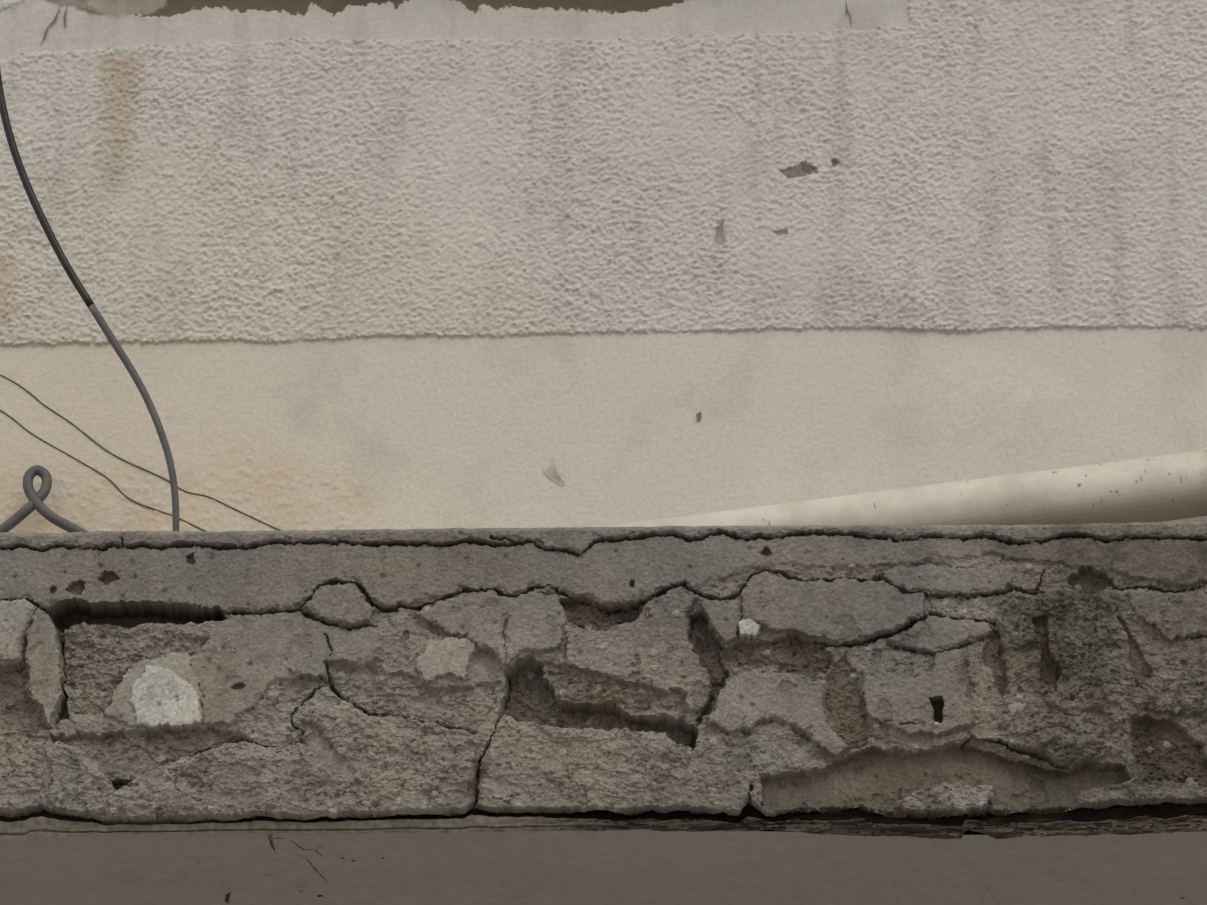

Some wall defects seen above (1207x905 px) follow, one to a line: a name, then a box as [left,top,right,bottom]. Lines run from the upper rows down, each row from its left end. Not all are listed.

peeling [51,599,245,790]
spalling [277,673,332,704]
crack [0,528,1207,830]
spalling [415,564,1207,819]
crack [267,827,346,881]